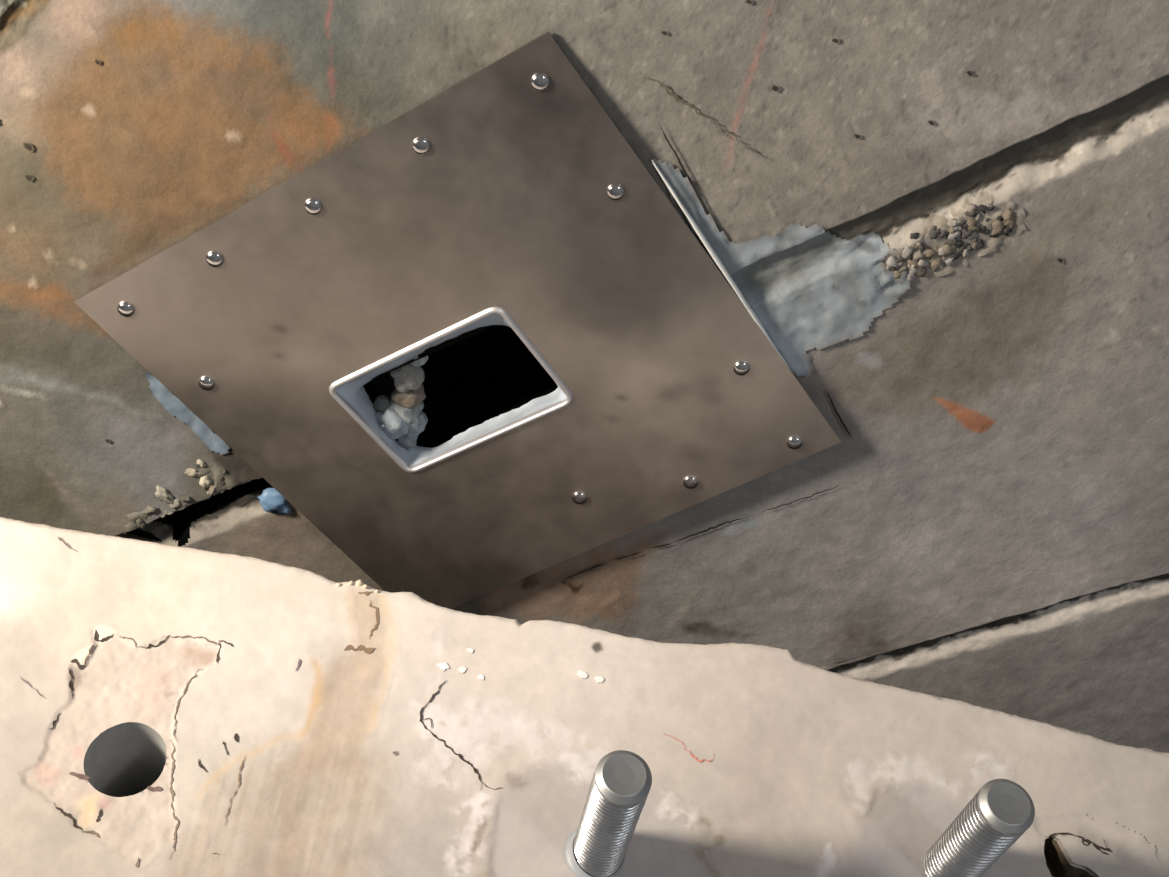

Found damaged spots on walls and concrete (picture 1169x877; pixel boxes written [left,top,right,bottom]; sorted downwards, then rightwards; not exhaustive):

corrosion [0,0,376,343]
spalling [884,191,1027,294]
spalling [18,623,233,871]
crack [420,680,501,789]
hole [1044,836,1093,877]